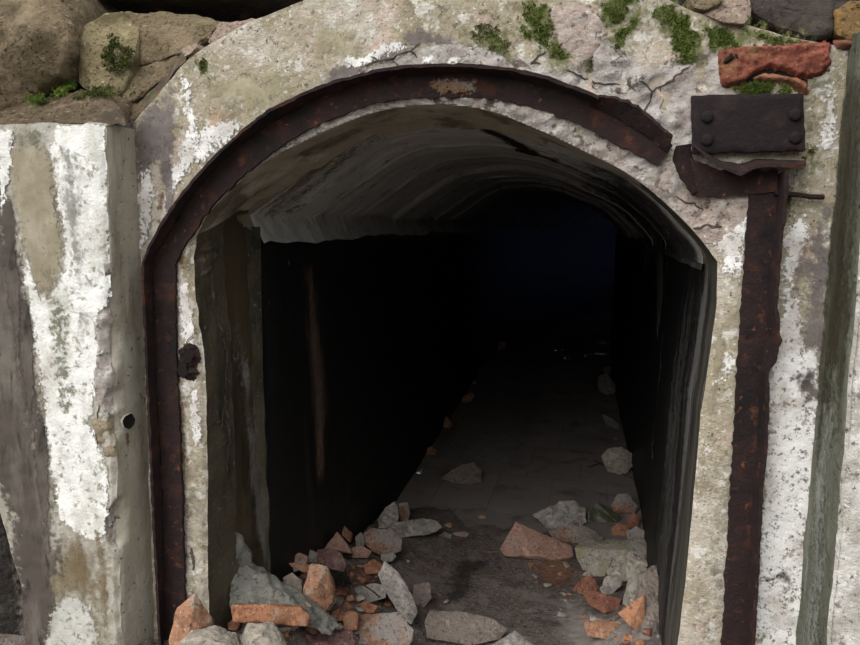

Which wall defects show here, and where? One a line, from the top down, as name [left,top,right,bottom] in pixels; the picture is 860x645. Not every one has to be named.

leakage [0,127,113,645]
leakage [134,73,240,249]
crack [566,66,690,111]
leakage [755,77,860,645]